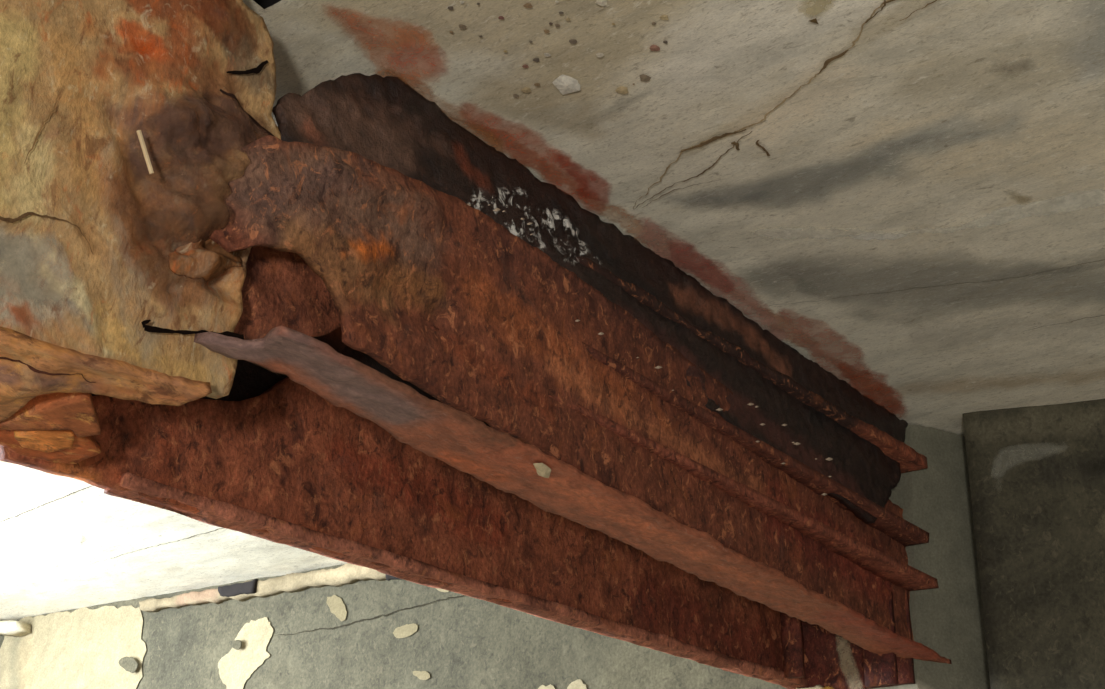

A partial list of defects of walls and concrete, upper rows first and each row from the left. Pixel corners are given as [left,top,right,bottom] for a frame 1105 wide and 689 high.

crack [24,89,60,164]
crack [633,0,937,209]
crack [0,212,94,255]
corrosion [443,111,905,417]
crack [0,357,95,383]
peeling [0,605,146,689]
peeling [218,617,273,689]
peeling [538,679,587,689]